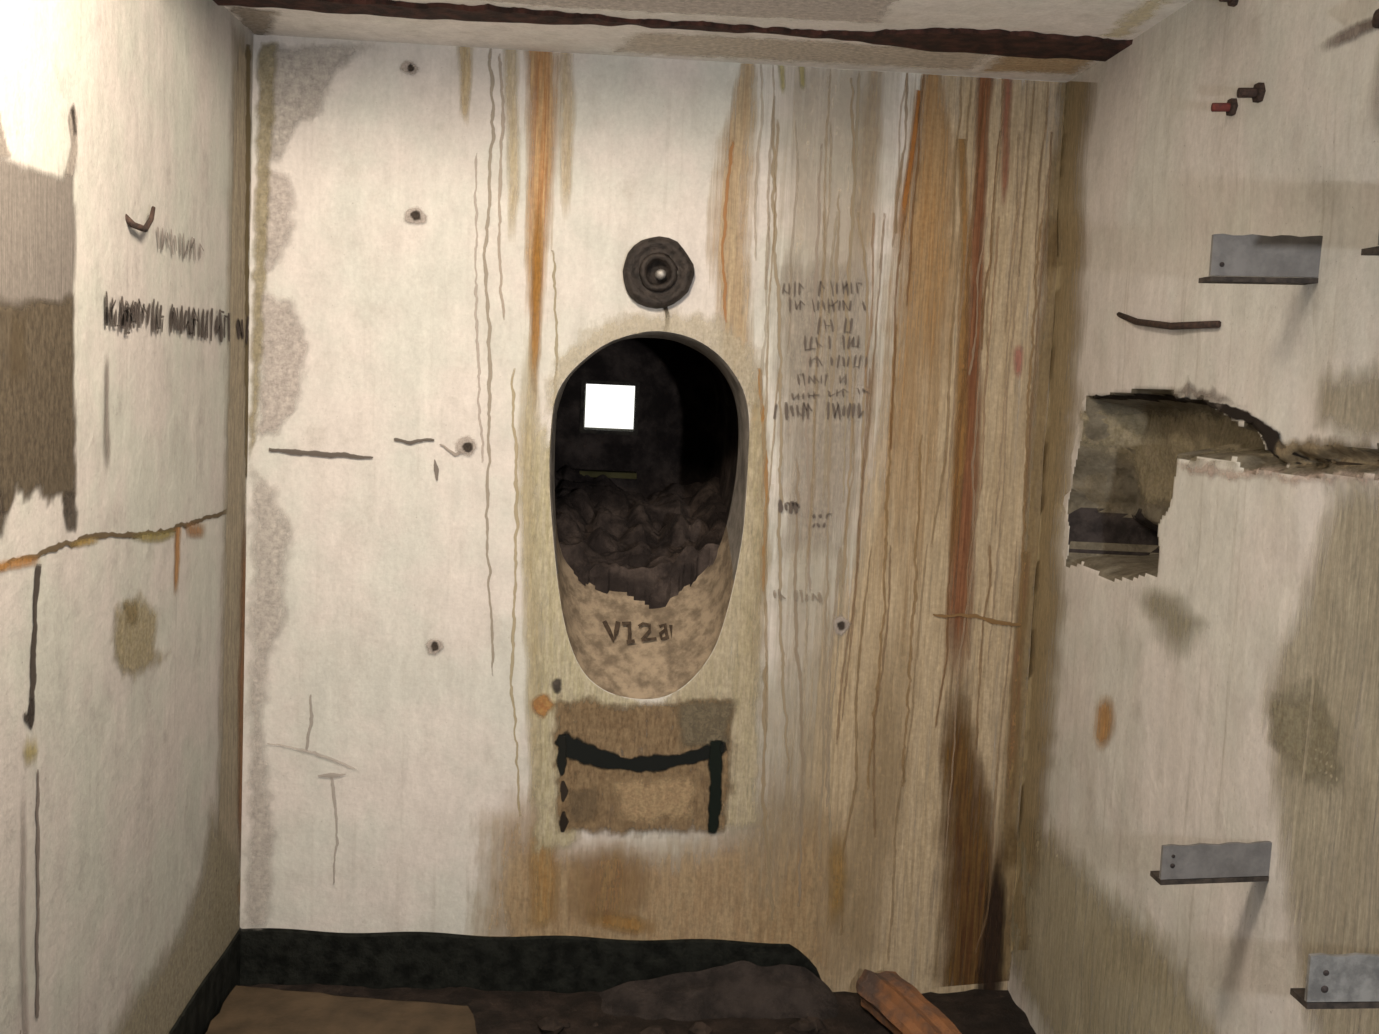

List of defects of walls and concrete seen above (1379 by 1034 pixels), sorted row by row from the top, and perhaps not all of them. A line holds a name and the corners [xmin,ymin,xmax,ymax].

crack [0,509,226,1034]
water stain [115,7,274,1034]
peeling [249,482,290,925]
peeling [249,44,355,446]
crack [306,695,345,883]
corrosion [460,47,471,115]
corrosion [506,49,572,806]
corrosion [717,63,769,679]
corrosion [888,74,1011,651]
corrosion [941,693,1005,990]
corrosion [1008,551,1028,796]